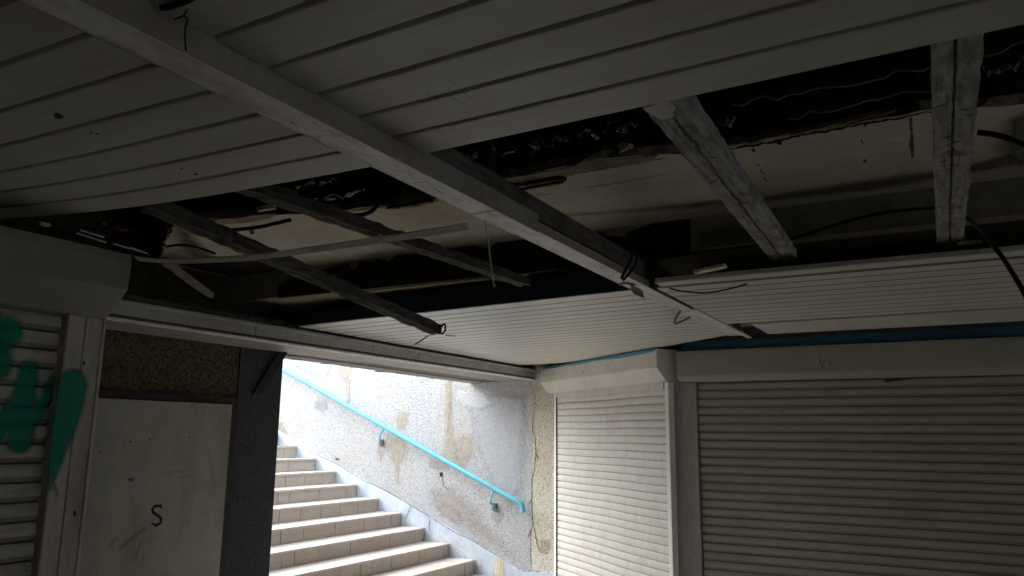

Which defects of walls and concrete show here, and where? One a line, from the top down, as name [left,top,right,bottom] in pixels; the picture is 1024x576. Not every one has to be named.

crack [291,389,543,573]